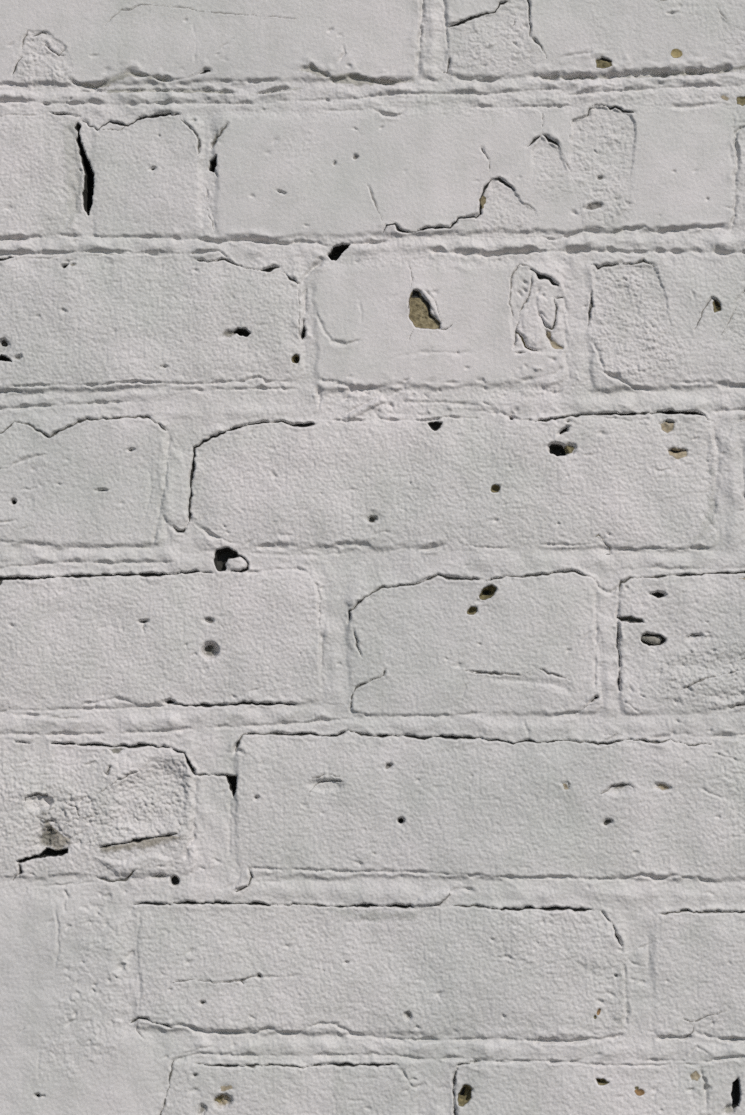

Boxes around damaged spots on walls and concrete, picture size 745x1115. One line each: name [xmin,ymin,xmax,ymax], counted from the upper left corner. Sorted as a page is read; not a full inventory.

crack [52,113,228,174]
crack [198,259,297,283]
peeling [408,267,452,336]
peeling [509,264,566,355]
crack [189,426,242,522]
spalling [214,548,238,571]
crack [349,583,419,654]
crack [465,668,562,677]
crack [160,1060,242,1115]
spalling [731,1079,740,1108]